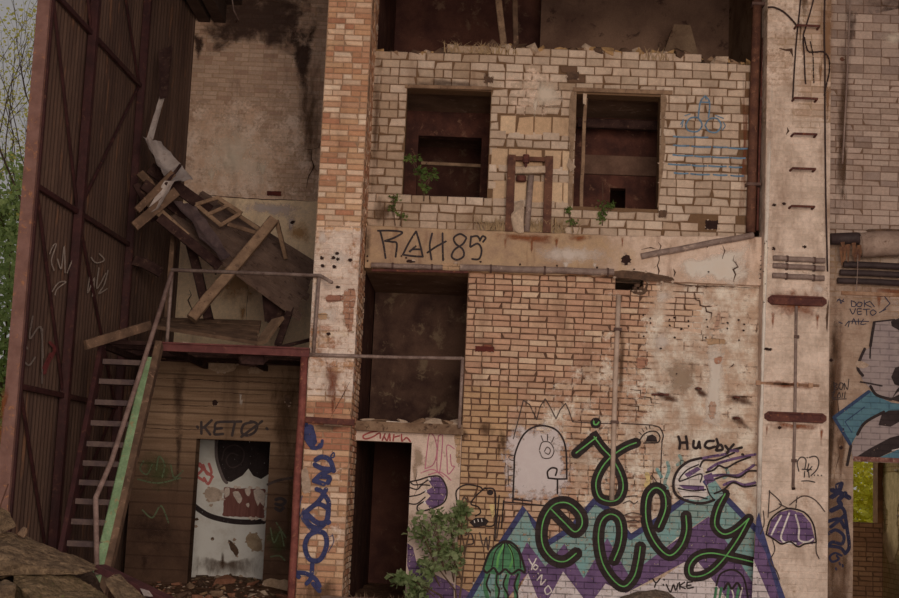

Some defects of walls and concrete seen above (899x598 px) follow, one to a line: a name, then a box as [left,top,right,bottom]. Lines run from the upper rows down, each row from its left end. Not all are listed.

damp [295,39,316,154]
spalling [324,285,356,333]
peeling [703,313,727,424]